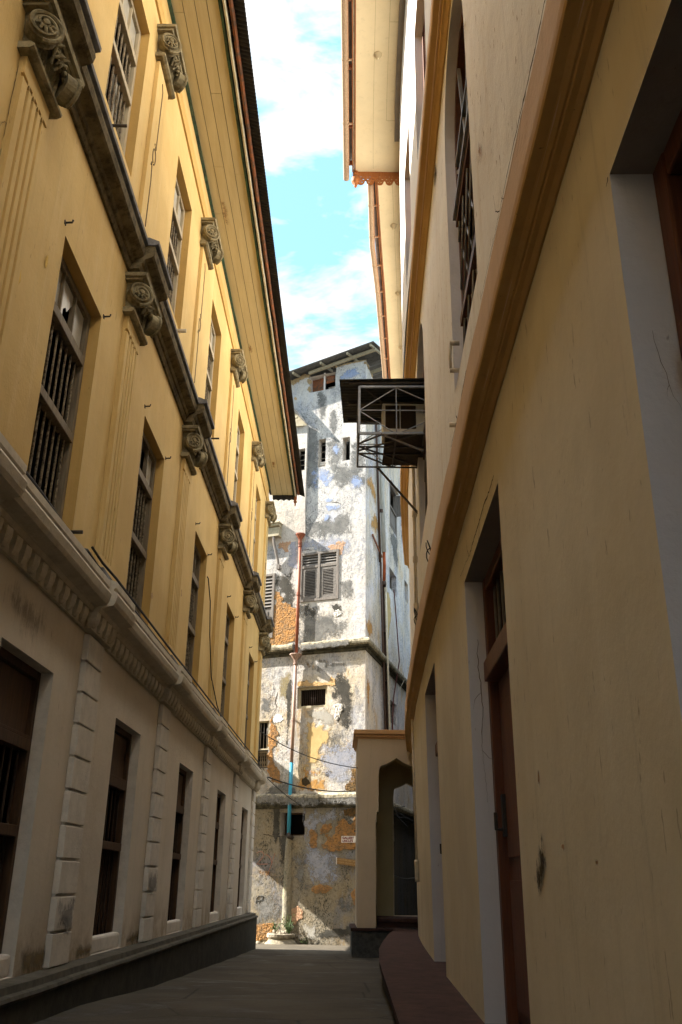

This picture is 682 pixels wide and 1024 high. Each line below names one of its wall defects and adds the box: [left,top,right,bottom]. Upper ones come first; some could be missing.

damp [307,391,367,491]
damp [305,514,351,538]
flaking render [270,591,296,645]
damp [306,660,353,755]
peeling [297,722,356,792]
flaking render [303,807,356,894]
flaking render [256,922,274,941]